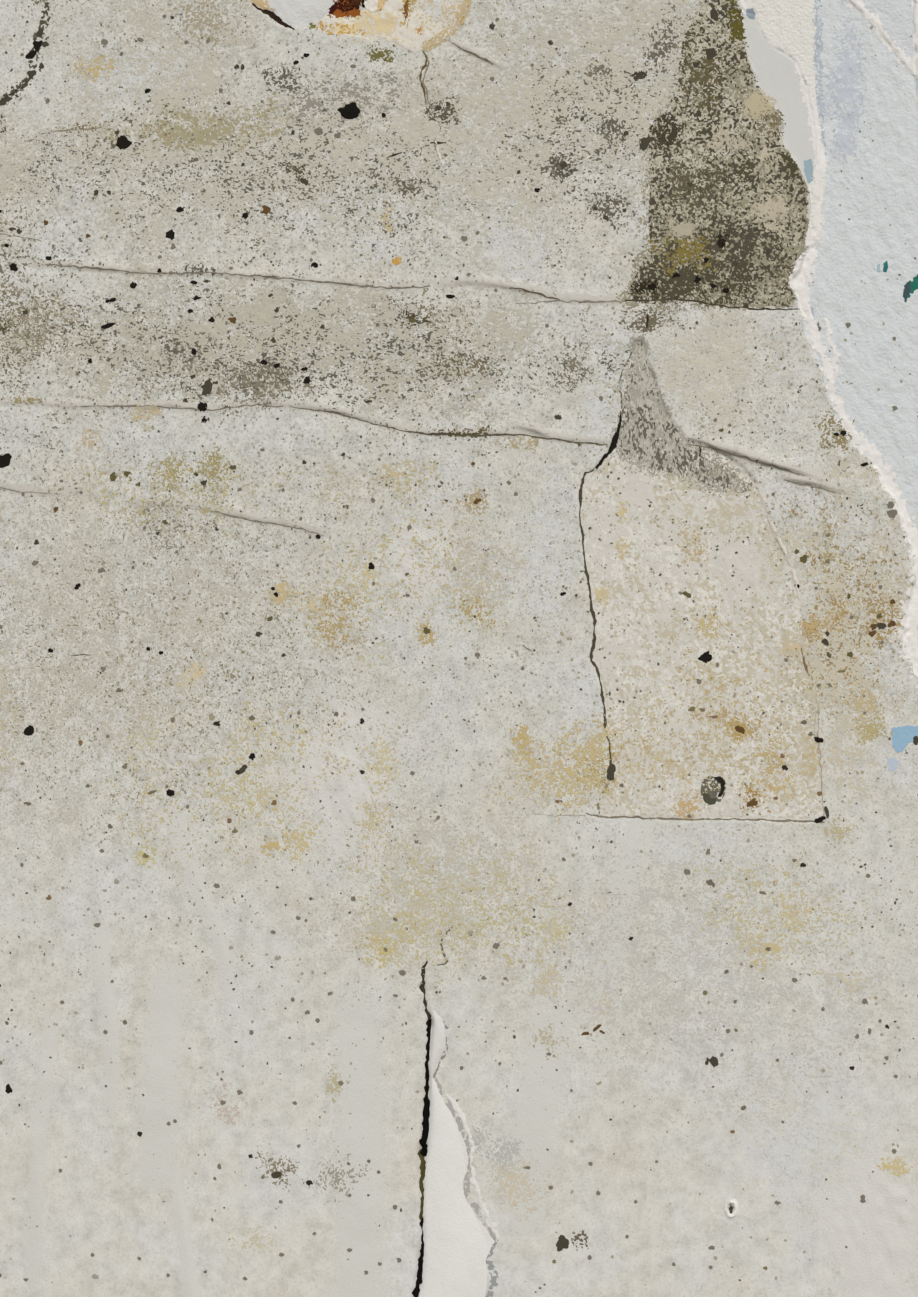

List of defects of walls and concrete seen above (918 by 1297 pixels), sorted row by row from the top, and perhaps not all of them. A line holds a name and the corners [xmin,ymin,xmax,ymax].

crack [0,233,430,289]
peeling [258,0,468,52]
crack [75,288,841,823]
leakage [0,0,918,833]
peeling [708,0,918,535]